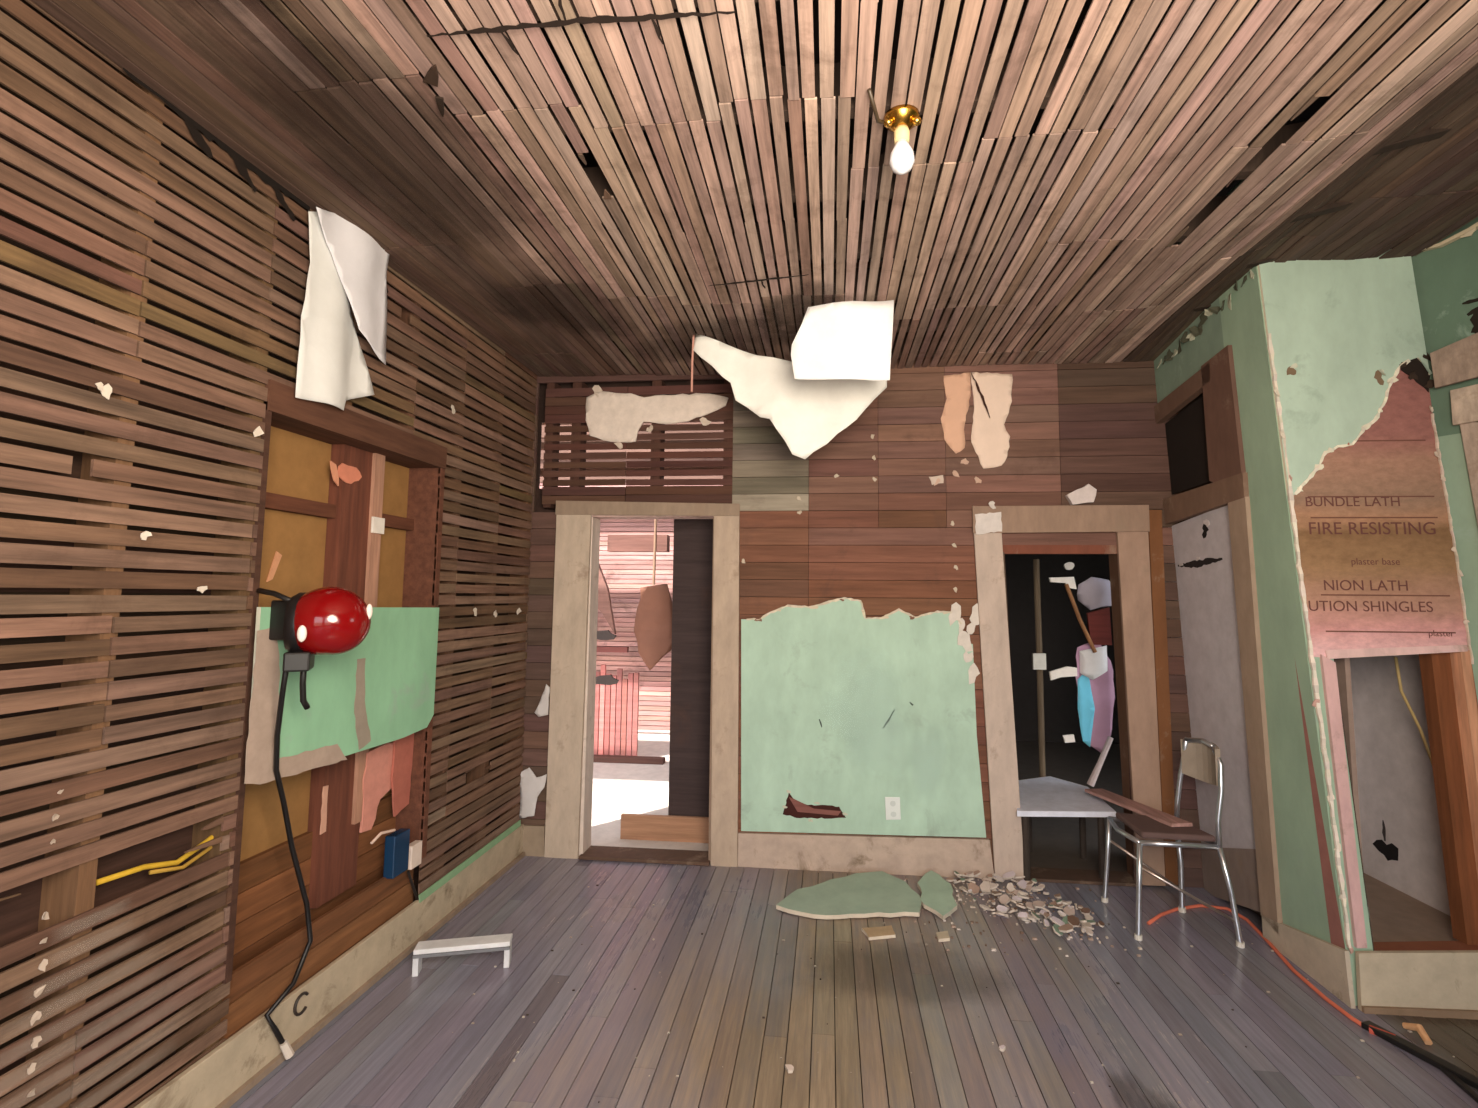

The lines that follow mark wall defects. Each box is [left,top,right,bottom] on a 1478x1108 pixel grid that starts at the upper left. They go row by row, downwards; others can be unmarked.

flaking render [586,385,728,449]
peeling [934,372,982,486]
spalling [1374,352,1474,664]
peeling [747,597,980,684]